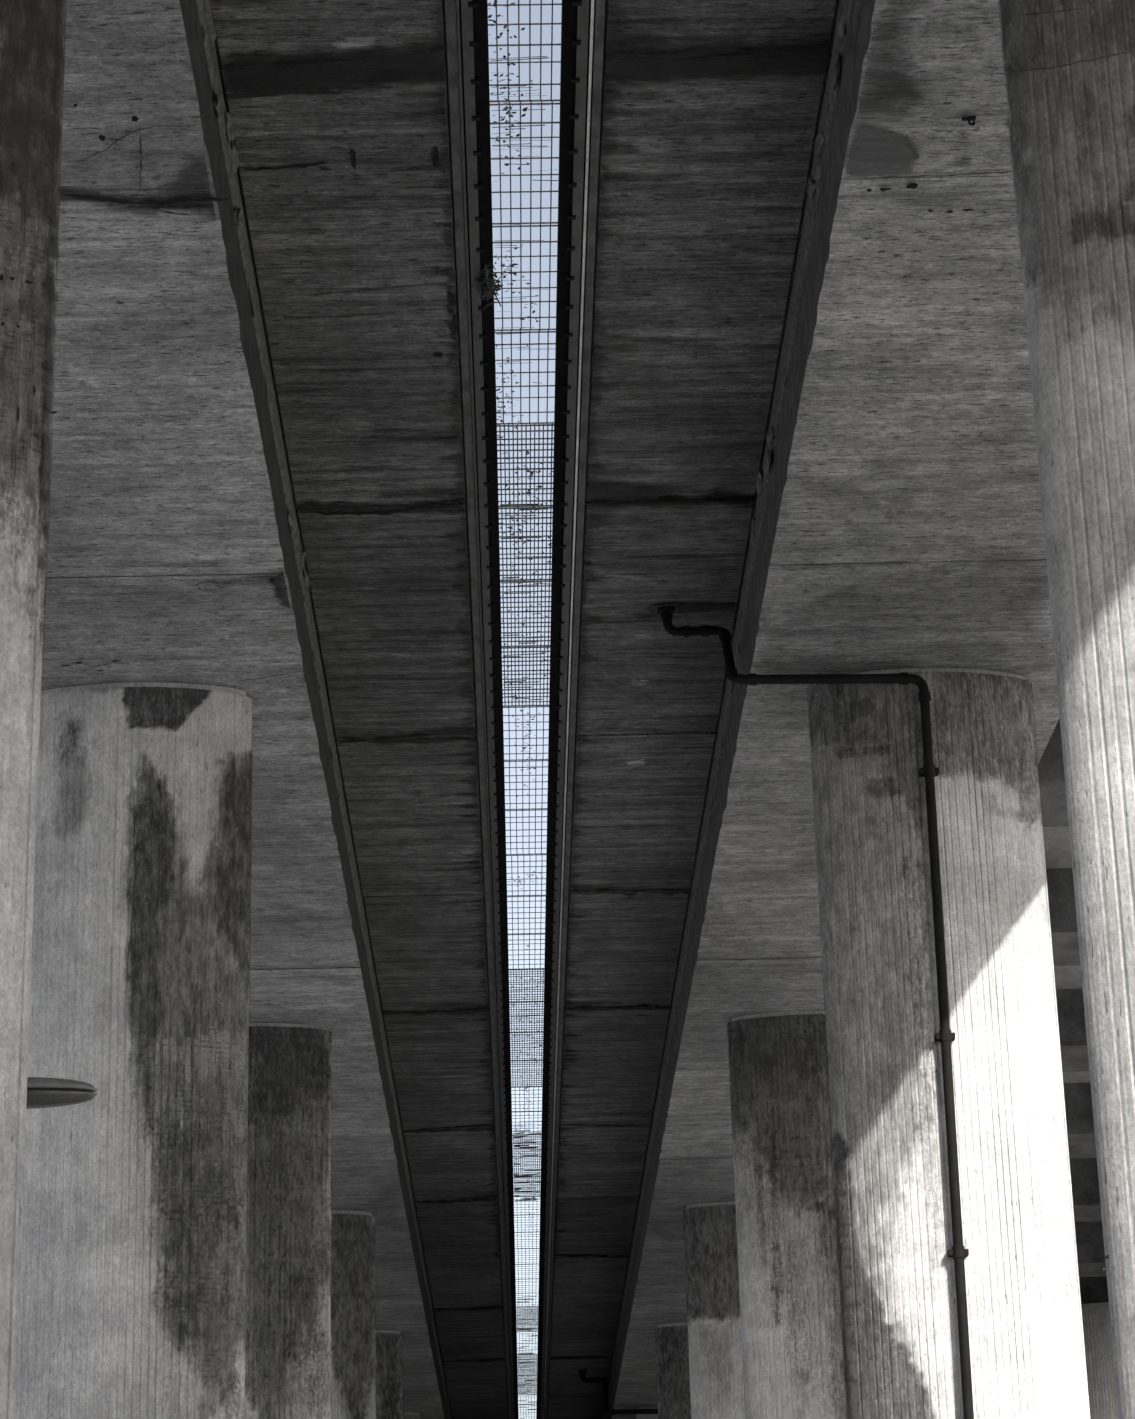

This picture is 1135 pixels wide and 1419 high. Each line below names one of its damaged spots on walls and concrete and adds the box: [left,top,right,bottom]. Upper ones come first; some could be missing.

water stain [0,0,216,633]
water stain [1003,0,1135,315]
water stain [127,755,415,1419]
water stain [655,1204,740,1419]
water stain [727,672,1032,1419]